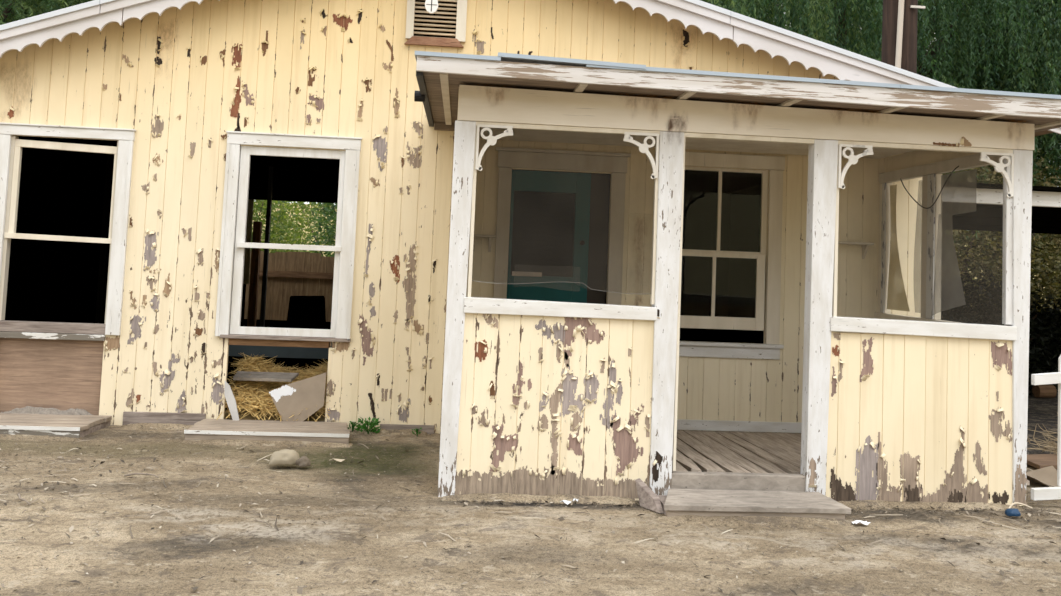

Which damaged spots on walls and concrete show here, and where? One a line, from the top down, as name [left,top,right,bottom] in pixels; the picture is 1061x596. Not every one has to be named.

peeling [320,9,363,43]
peeling [186,43,255,127]
peeling [295,66,324,125]
peeling [370,88,400,188]
peeling [103,229,172,351]
peeling [153,285,224,414]
peeling [330,223,376,366]
peeling [390,244,433,372]
peeling [455,317,663,499]
peeling [855,426,989,503]
peeling [989,391,1012,443]
peeling [991,341,1012,375]